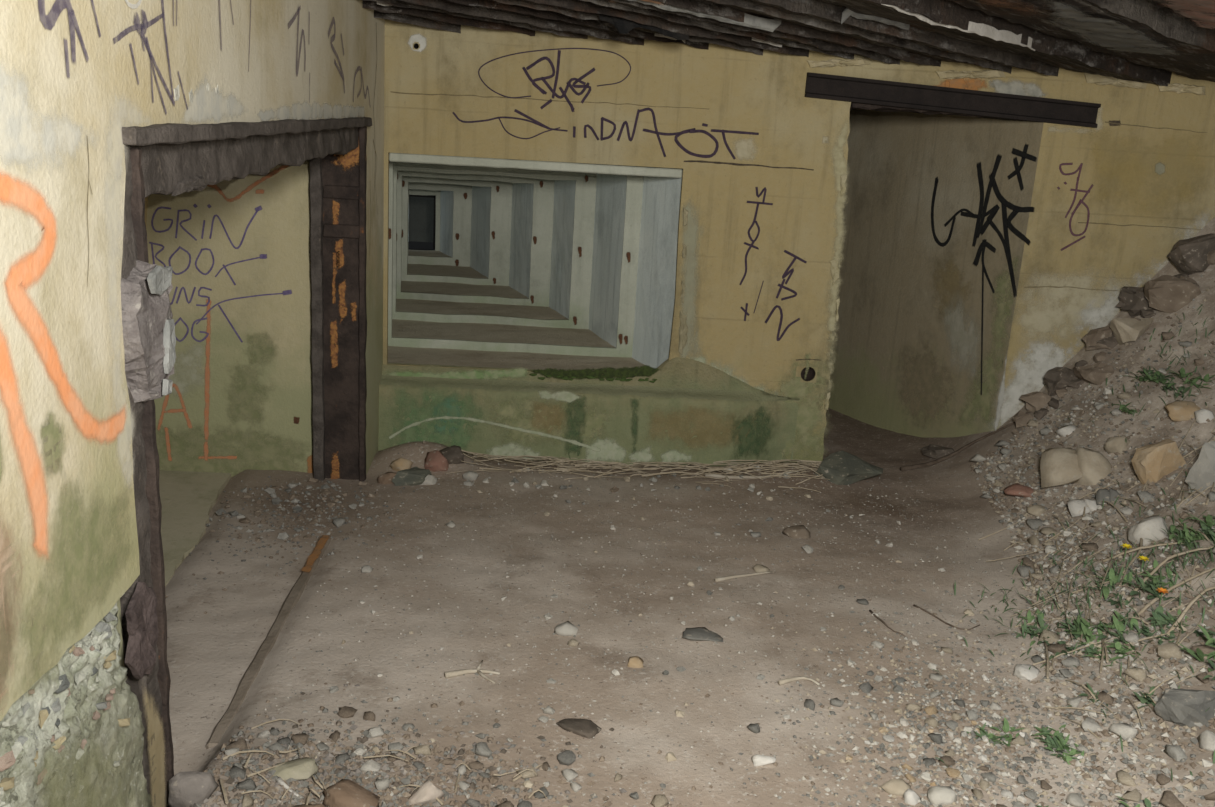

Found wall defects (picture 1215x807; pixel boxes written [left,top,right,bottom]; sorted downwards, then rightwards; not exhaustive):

corrosion [332,201,340,224]
corrosion [333,146,359,168]
corrosion [330,239,357,368]
leakage [389,398,691,462]
leakage [0,526,17,700]
spalling [0,593,152,807]